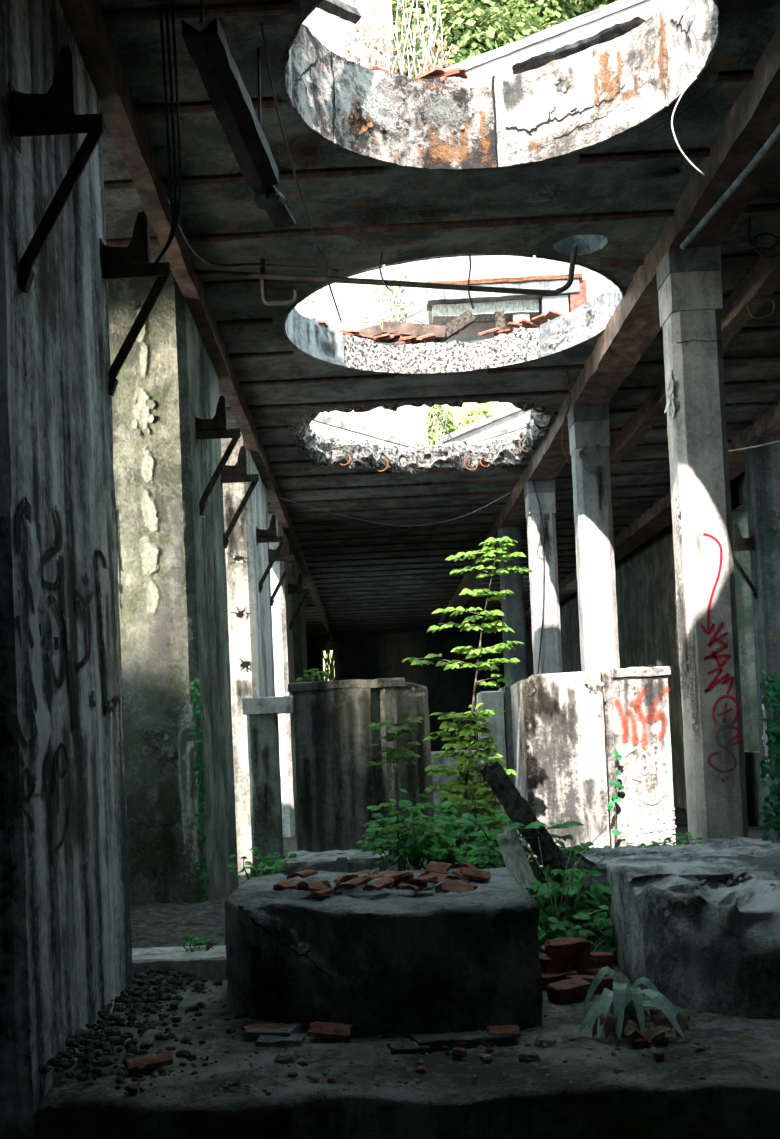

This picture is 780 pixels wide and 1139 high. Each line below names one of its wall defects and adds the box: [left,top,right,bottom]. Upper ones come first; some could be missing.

corrosion [594,50,637,109]
corrosion [657,13,670,92]
corrosion [420,110,490,162]
crack [491,76,625,164]
peeling [131,308,159,614]
spalling [288,400,555,475]
leakage [528,674,577,762]
leakage [534,772,603,845]